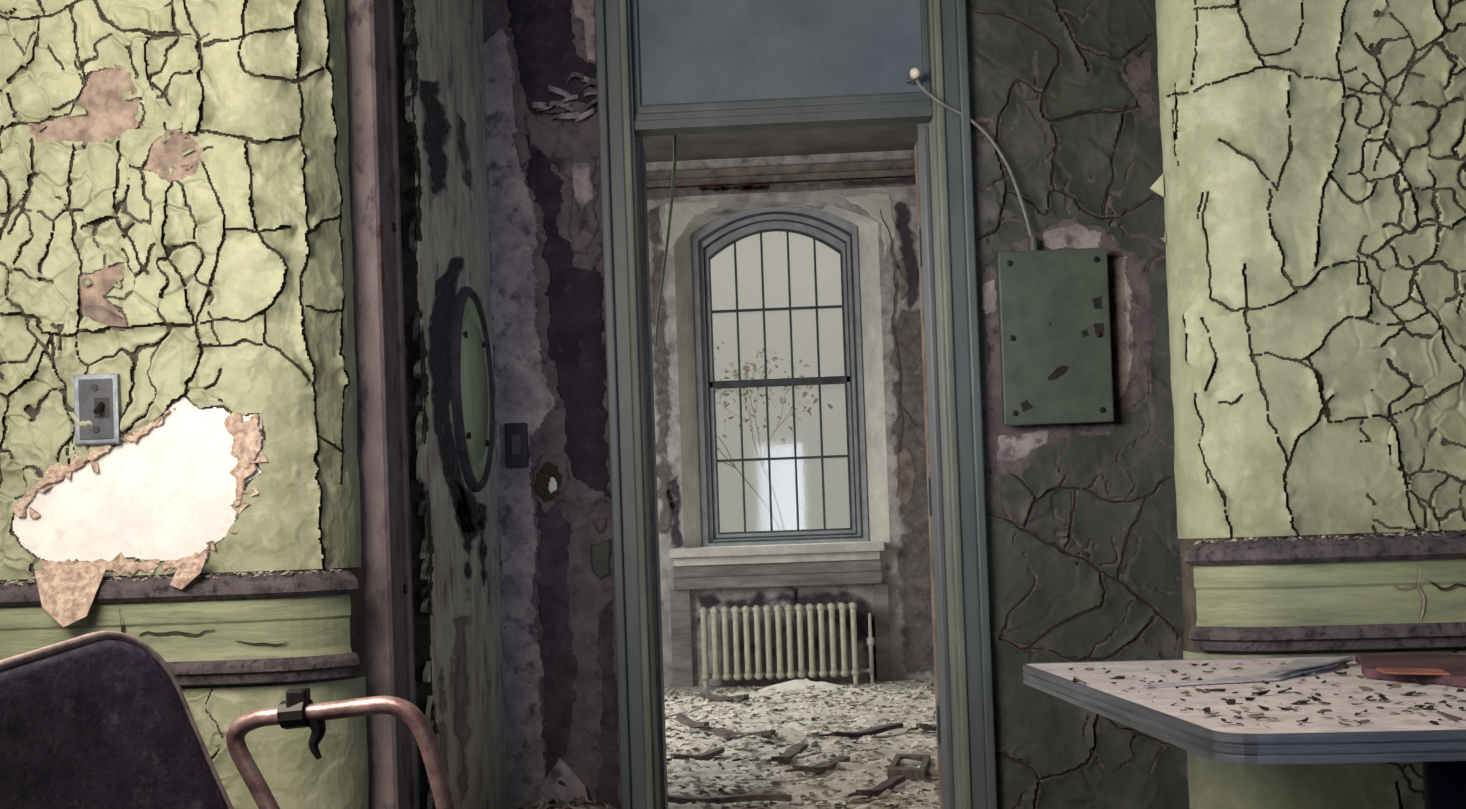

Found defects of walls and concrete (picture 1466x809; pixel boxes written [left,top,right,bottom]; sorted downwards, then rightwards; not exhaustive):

crack [0,0,343,487]
peeling [0,0,361,627]
spalling [394,0,439,742]
spalling [417,743,436,809]
flaking render [483,0,612,809]
flaking render [595,598,622,809]
flaking render [662,197,721,250]
flaking render [838,192,897,259]
crack [986,474,1180,662]
crack [995,714,1175,809]
peeling [967,0,1466,809]
crack [973,0,1466,622]